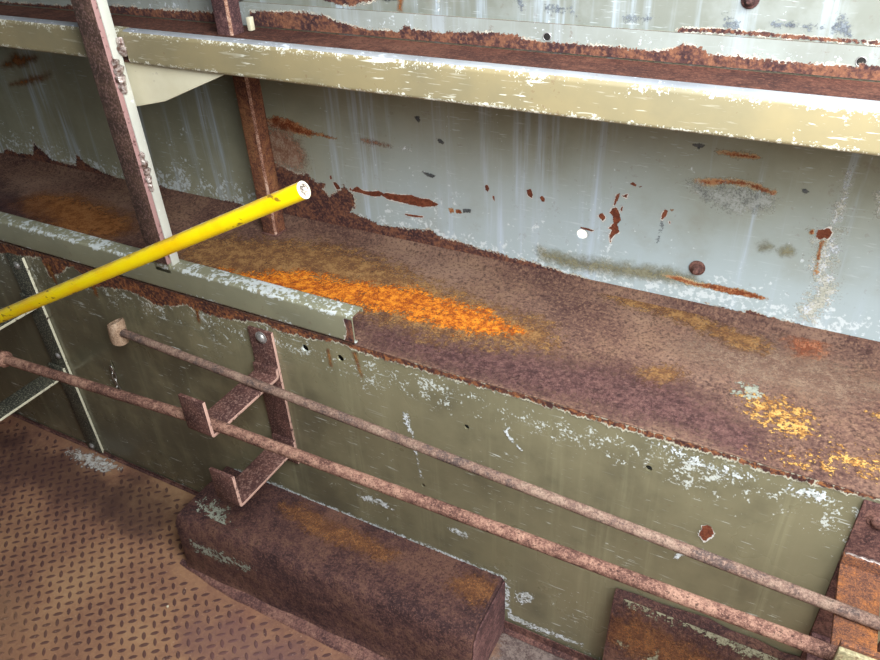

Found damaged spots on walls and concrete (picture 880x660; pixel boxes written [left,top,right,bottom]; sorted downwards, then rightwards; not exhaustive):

corrosion [249,9,880,81]
corrosion [3,140,122,179]
corrosion [267,115,588,279]
peeling [687,177,777,214]
corrosion [0,242,93,284]
peeling [705,170,852,325]
corrosion [92,233,880,501]
peeling [651,442,757,482]
peeling [785,482,835,504]
corrosion [276,502,402,564]
peeling [698,525,715,550]
corrosion [448,574,496,608]